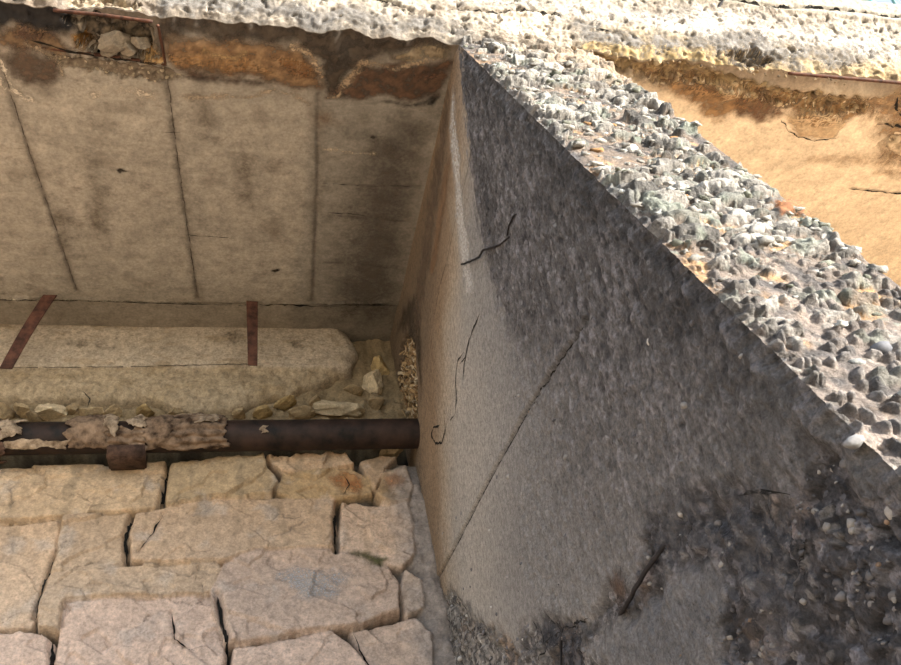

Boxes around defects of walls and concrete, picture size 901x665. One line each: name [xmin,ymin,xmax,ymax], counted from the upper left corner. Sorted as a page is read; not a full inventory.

spalling [43,0,188,82]
crack [431,315,479,445]
crack [442,323,586,572]
crack [124,473,169,563]
crack [36,563,53,618]
crack [48,643,56,665]
crack [172,617,192,650]
crack [217,599,229,665]
crack [538,618,588,660]